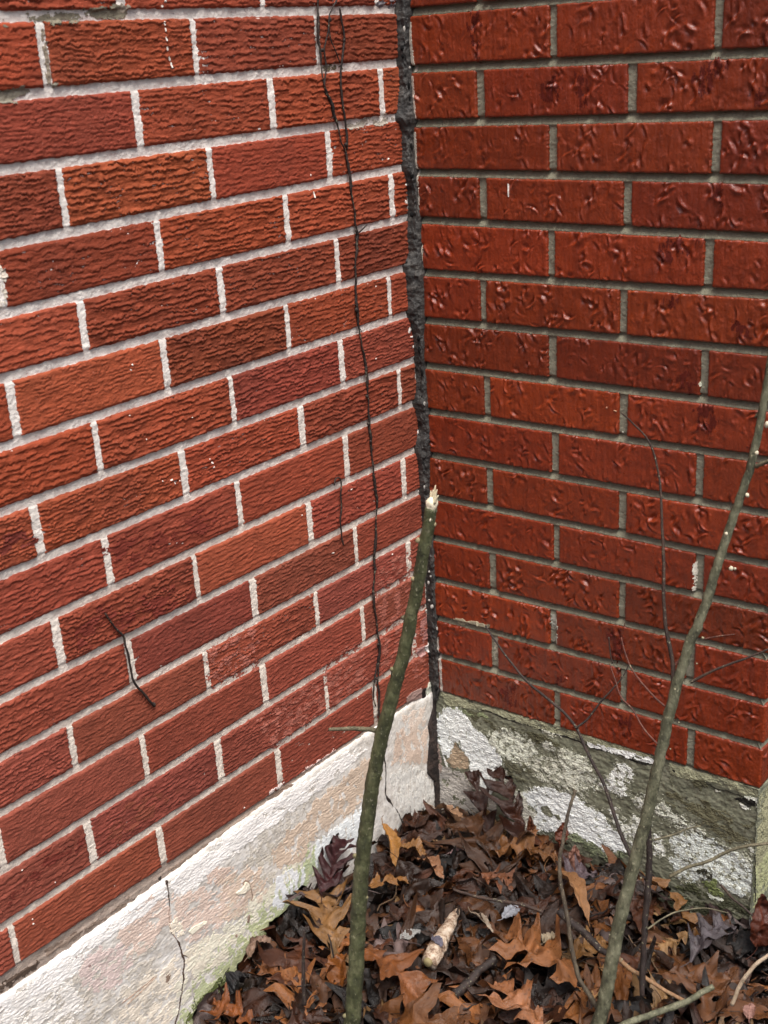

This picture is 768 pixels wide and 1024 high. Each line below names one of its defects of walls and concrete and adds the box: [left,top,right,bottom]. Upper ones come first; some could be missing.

water stain [468,710,562,748]
water stain [587,742,654,764]
water stain [504,761,544,788]
peeling [437,704,757,902]
water stain [660,790,758,845]
water stain [662,893,750,918]